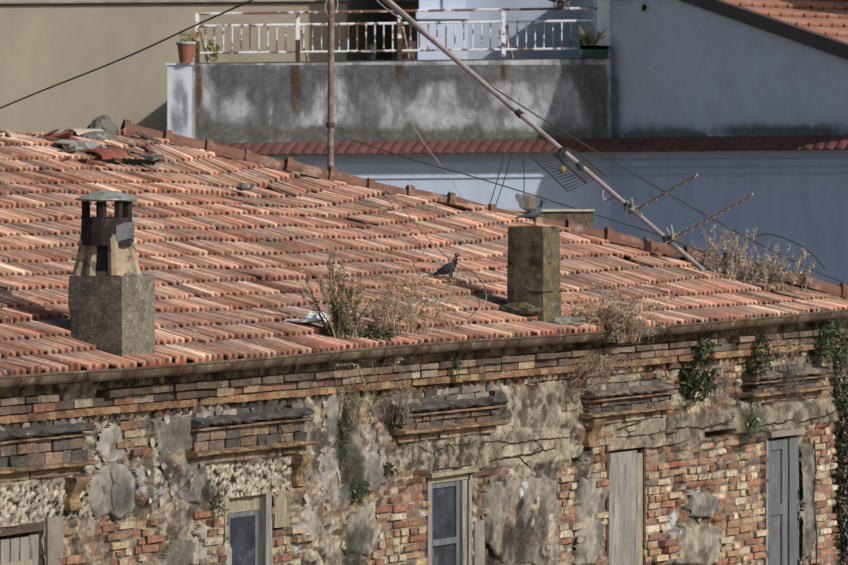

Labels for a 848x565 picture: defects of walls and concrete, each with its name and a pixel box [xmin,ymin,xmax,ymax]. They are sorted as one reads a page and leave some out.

leakage [172,81,187,132]
leakage [196,59,705,143]
leakage [715,125,846,137]
spalling [84,414,232,565]
spalling [272,385,427,565]
crack [419,437,588,471]
crack [615,416,735,440]
spalling [644,447,769,565]